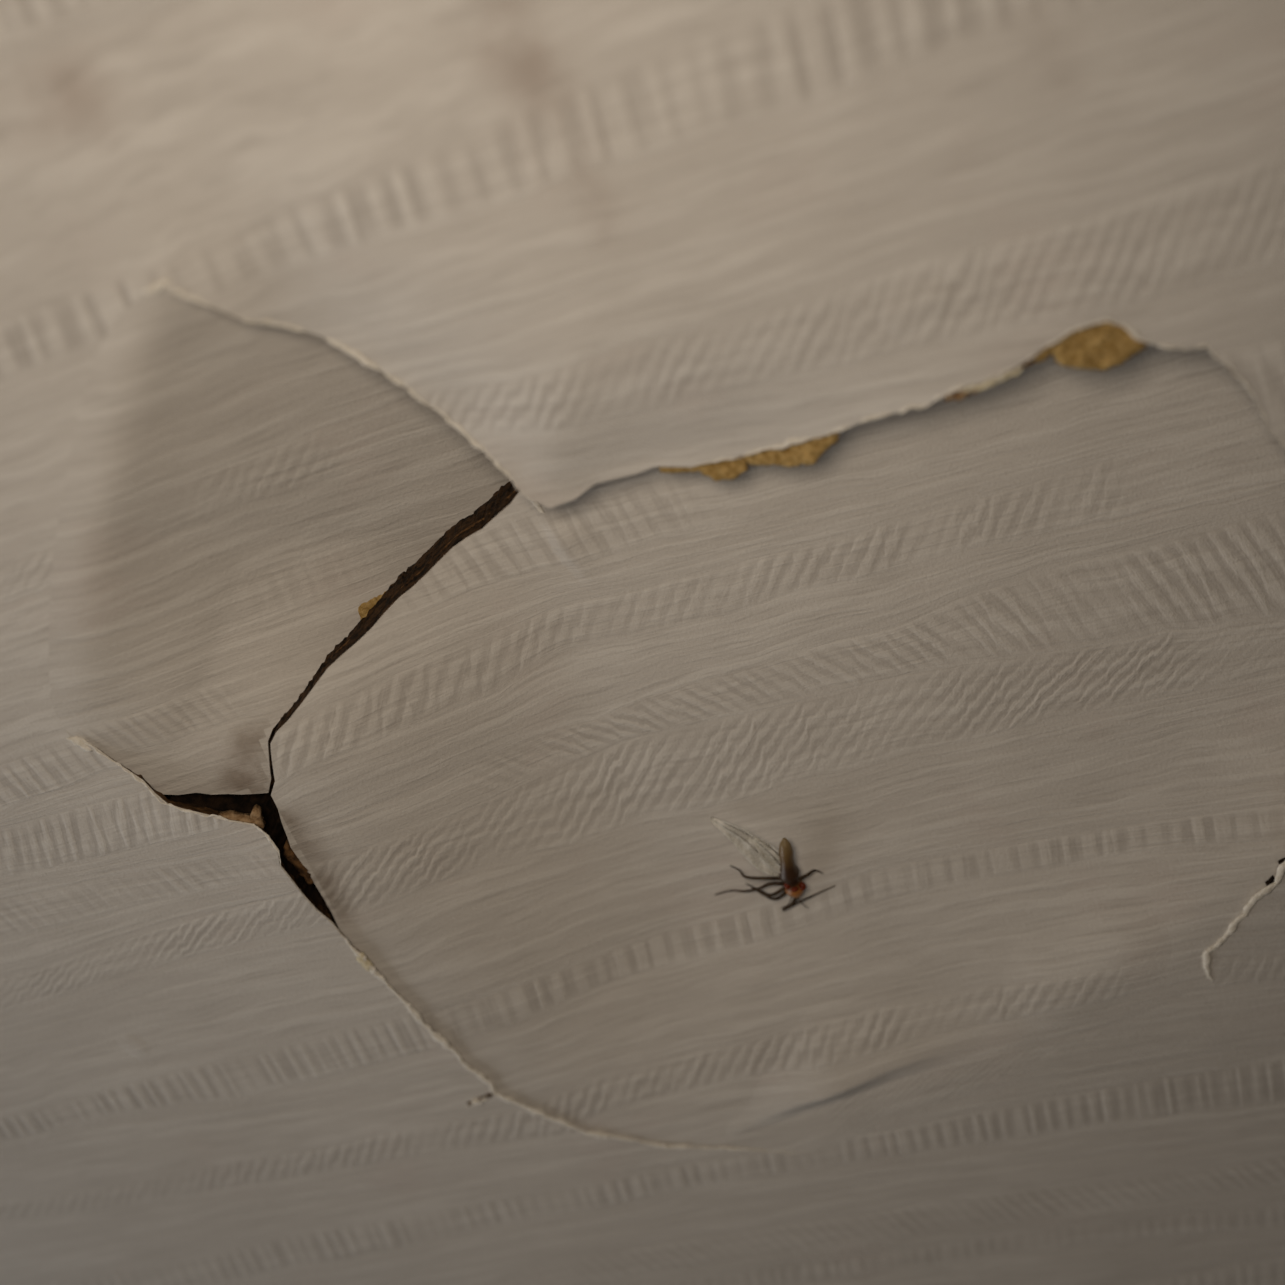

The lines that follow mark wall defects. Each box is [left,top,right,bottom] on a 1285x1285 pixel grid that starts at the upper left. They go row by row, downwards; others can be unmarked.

spalling [944,322,1148,402]
spalling [659,432,841,481]
crack [77,481,519,924]